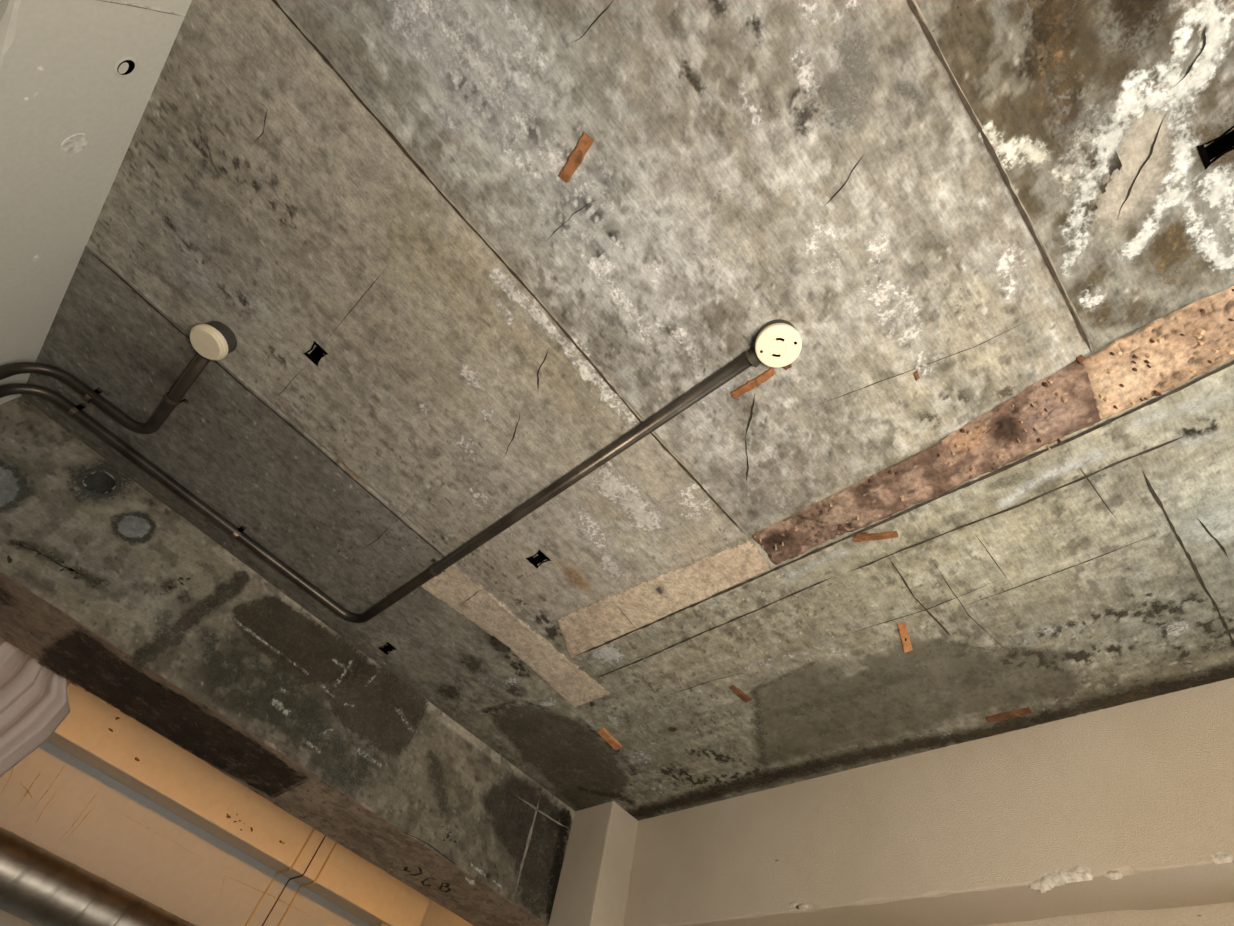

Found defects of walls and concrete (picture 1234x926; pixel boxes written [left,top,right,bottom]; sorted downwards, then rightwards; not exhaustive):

water stain [979,0,1234,285]
crack [1117,27,1206,220]
efflorescence [805,219,841,274]
efflorescence [996,246,1027,300]
efflorescence [859,231,941,380]
water stain [1080,290,1111,327]
spalling [752,286,1234,565]
water stain [0,459,34,512]
water stain [111,498,156,545]
crack [1197,518,1228,557]
efflorescence [1153,619,1198,636]
water stain [460,623,1234,924]